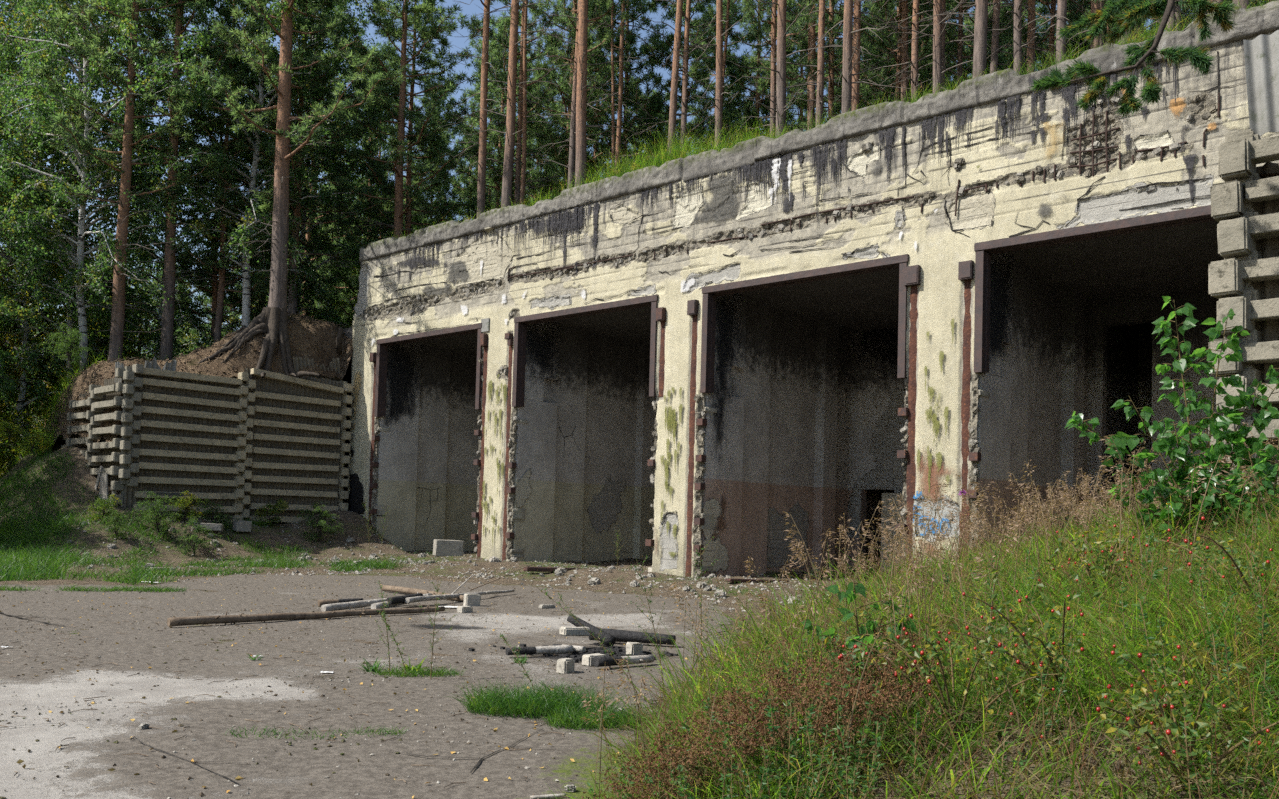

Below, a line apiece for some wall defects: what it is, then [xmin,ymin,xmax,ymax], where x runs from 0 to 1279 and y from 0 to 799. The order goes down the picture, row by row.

leakage [397,202,599,297]
leakage [680,278,695,292]
crack [584,210,878,304]
peeling [353,92,1220,322]
leakage [871,107,972,181]
crack [792,114,1212,238]
leakage [1036,204,1052,218]
leakage [995,60,1177,155]
leakage [1179,124,1196,206]
leakage [660,387,683,558]